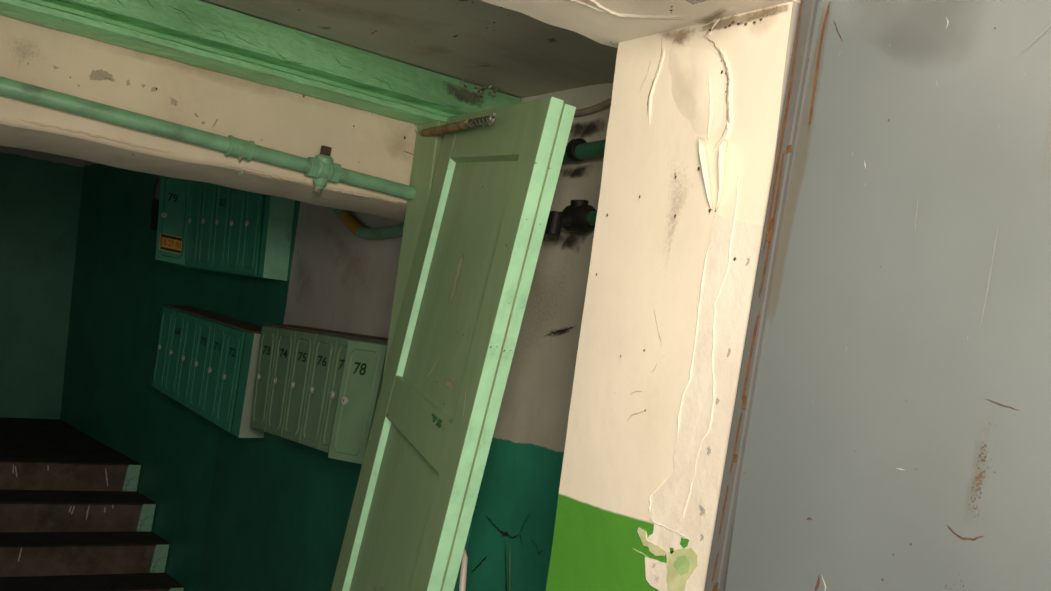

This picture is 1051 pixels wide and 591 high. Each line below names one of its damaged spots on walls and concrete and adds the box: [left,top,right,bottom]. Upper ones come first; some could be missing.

peeling [90,70,113,81]
leakage [665,30,686,42]
corrosion [759,0,830,295]
flaking render [637,118,764,591]
corrosion [730,314,760,472]